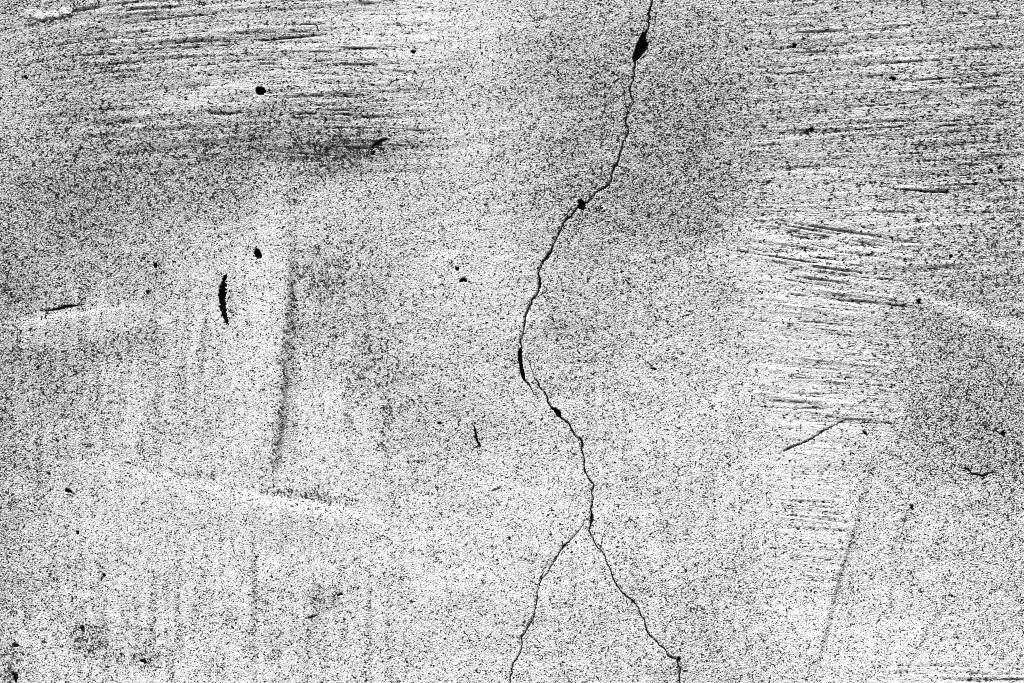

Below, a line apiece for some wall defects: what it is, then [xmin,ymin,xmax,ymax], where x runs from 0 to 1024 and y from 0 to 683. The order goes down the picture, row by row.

crack [509,0,681,683]